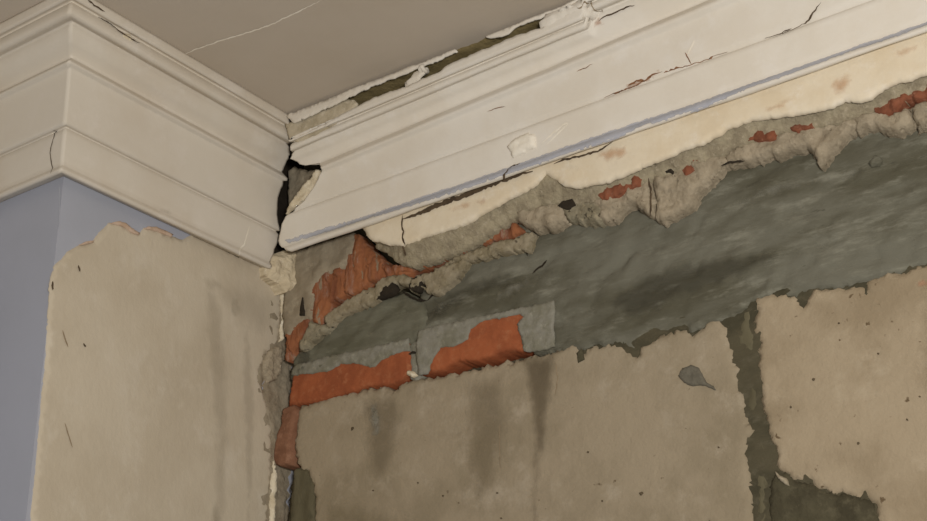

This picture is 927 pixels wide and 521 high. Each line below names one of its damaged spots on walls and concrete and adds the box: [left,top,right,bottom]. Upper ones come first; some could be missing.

peeling [348,0,599,106]
crack [606,52,726,97]
crack [767,4,820,38]
spalling [274,156,315,253]
crack [286,169,322,215]
spalling [375,76,927,276]
spalling [408,281,426,294]
peeling [30,221,417,521]